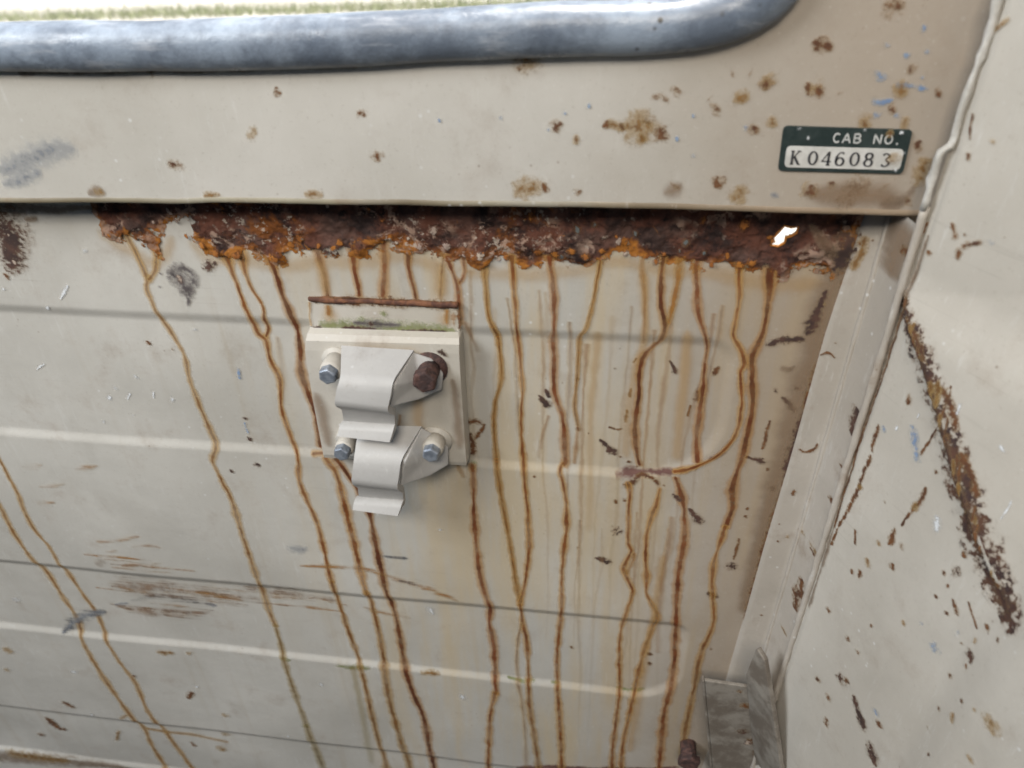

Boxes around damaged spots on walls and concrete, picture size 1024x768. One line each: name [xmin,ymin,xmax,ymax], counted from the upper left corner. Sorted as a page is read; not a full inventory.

corrosion [812,36,833,51]
corrosion [602,111,667,143]
corrosion [888,65,911,137]
corrosion [0,140,931,768]
corrosion [792,222,1022,668]